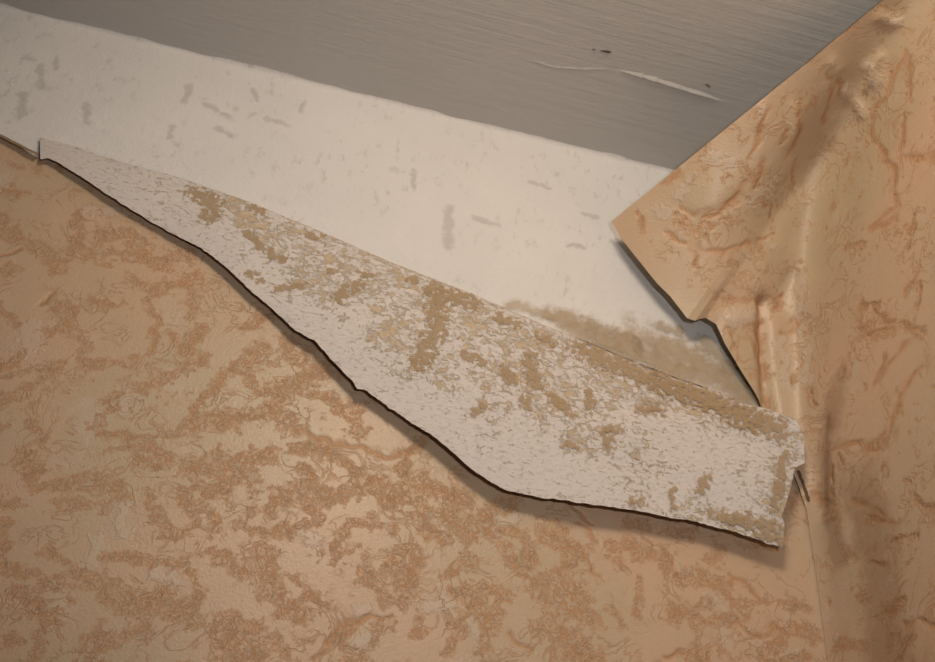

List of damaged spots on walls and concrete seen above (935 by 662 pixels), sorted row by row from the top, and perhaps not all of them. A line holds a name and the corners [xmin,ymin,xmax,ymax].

peeling [183,184,226,225]
peeling [249,203,266,215]
peeling [242,230,288,264]
peeling [243,270,308,293]
peeling [330,270,375,304]
peeling [405,275,488,373]
peeling [492,310,523,329]
peeling [470,401,490,418]
peeling [499,330,792,546]